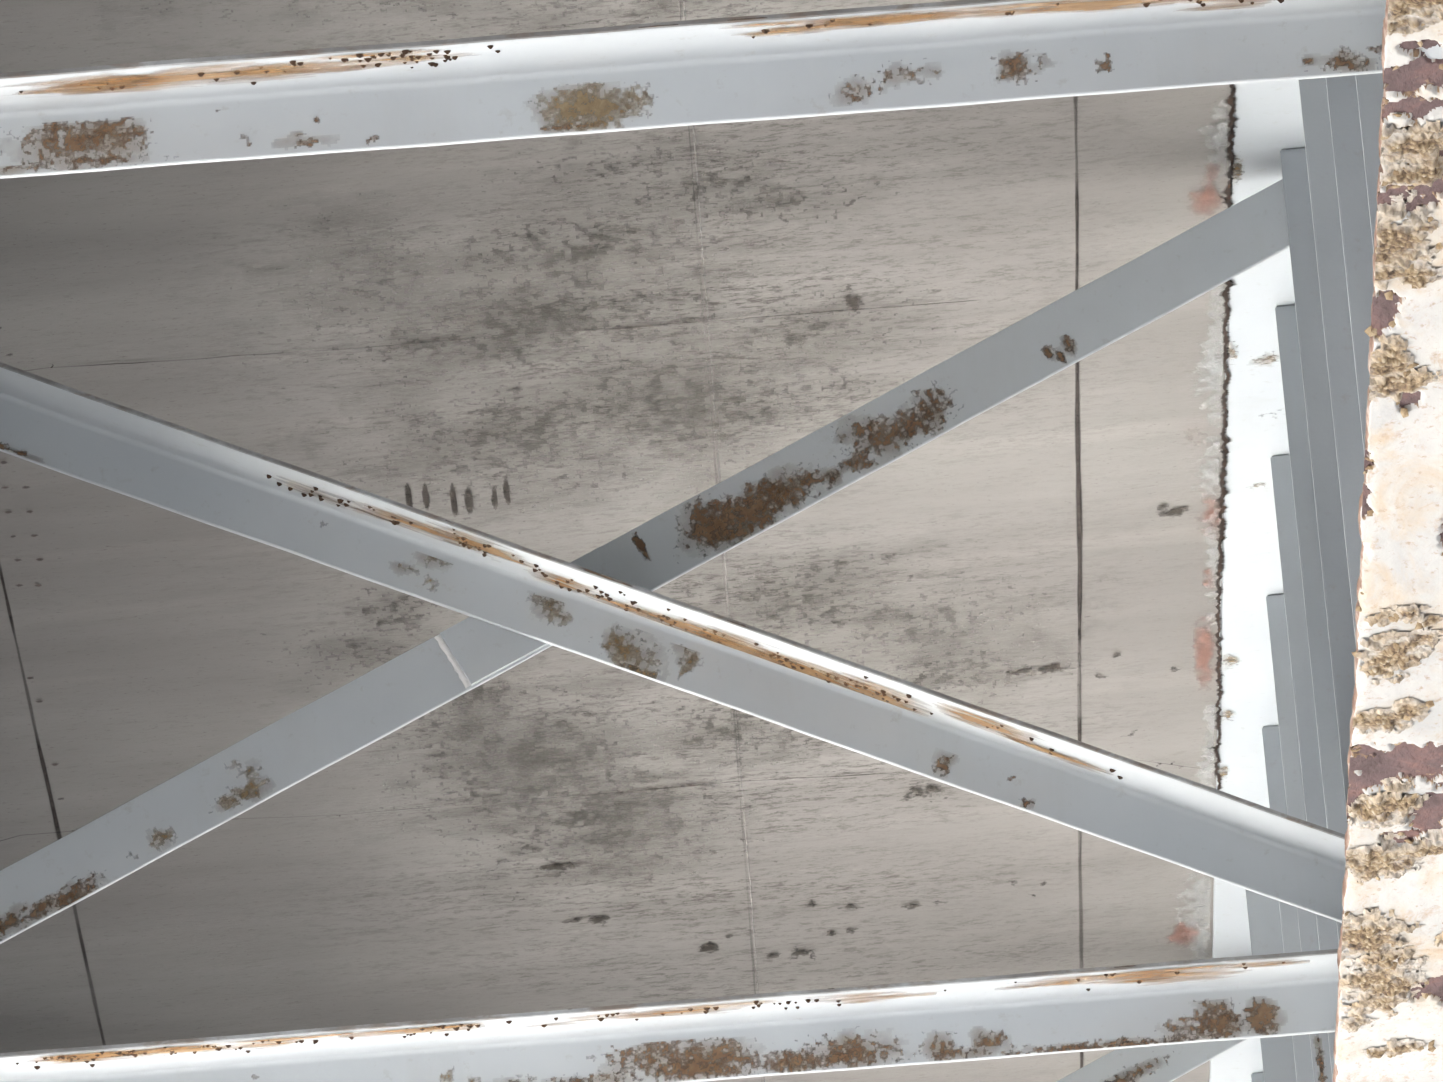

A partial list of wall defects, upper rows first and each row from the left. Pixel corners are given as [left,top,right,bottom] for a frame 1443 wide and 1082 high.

rust [730,0,1162,39]
peeling [1387,0,1443,36]
rust [19,49,458,94]
rust [1382,39,1443,128]
peeling [1374,120,1443,290]
peeling [1369,333,1443,402]
rust [267,474,1123,780]
peeling [1352,603,1443,735]
peeling [1345,777,1443,885]
peeling [1339,907,1443,1033]
rust [16,1024,480,1070]
rust [551,1027,903,1082]